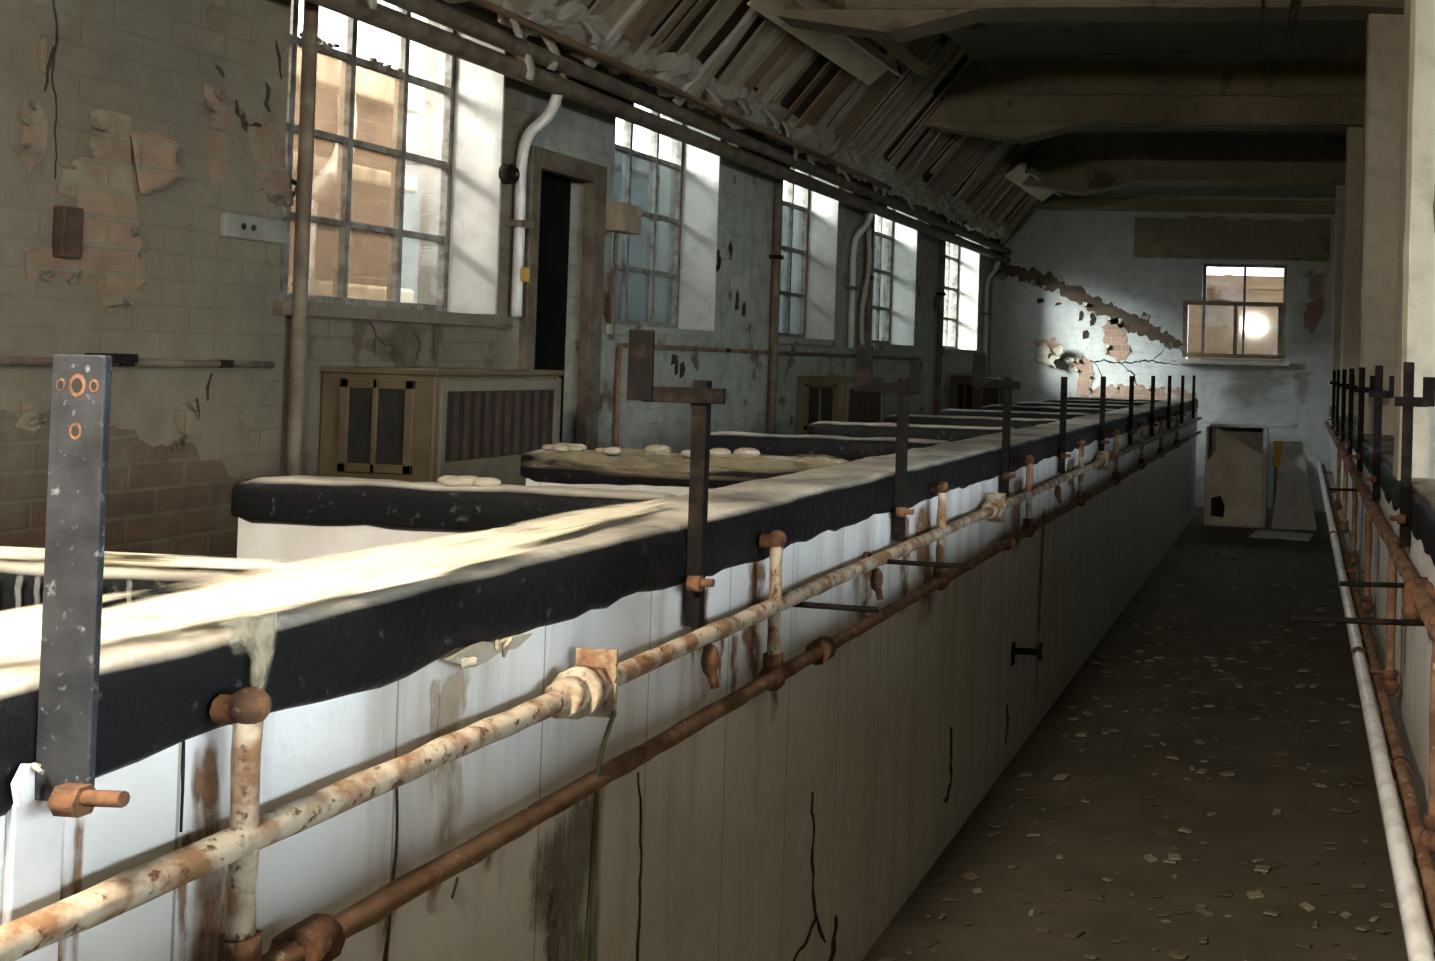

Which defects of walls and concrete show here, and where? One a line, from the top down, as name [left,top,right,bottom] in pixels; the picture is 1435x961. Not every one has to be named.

flaking render [497,0,1012,245]
peeling [14,98,184,309]
peeling [996,262,1199,403]
peeling [0,403,51,552]
peeling [104,426,251,561]
rust [182,748,219,847]
rust [179,870,228,961]